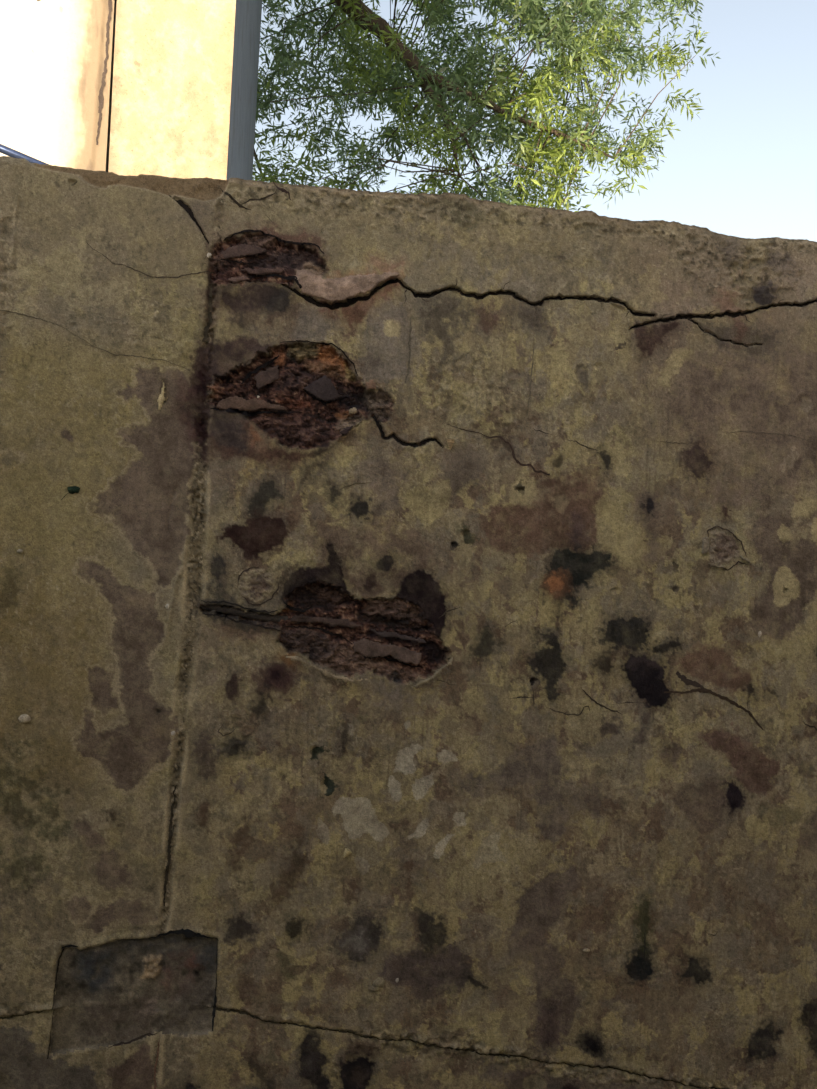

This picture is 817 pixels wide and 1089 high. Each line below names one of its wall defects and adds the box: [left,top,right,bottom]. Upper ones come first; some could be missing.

crack [96,0,112,145]
spalling [207,229,400,304]
rust [158,210,408,479]
spalling [206,340,395,452]
crack [373,415,550,475]
crack [282,278,817,384]
water stain [59,359,263,939]
spalling [198,566,454,689]
rust [207,502,455,644]
water stain [240,234,817,842]
water stain [220,821,371,948]
crack [216,1007,717,1089]